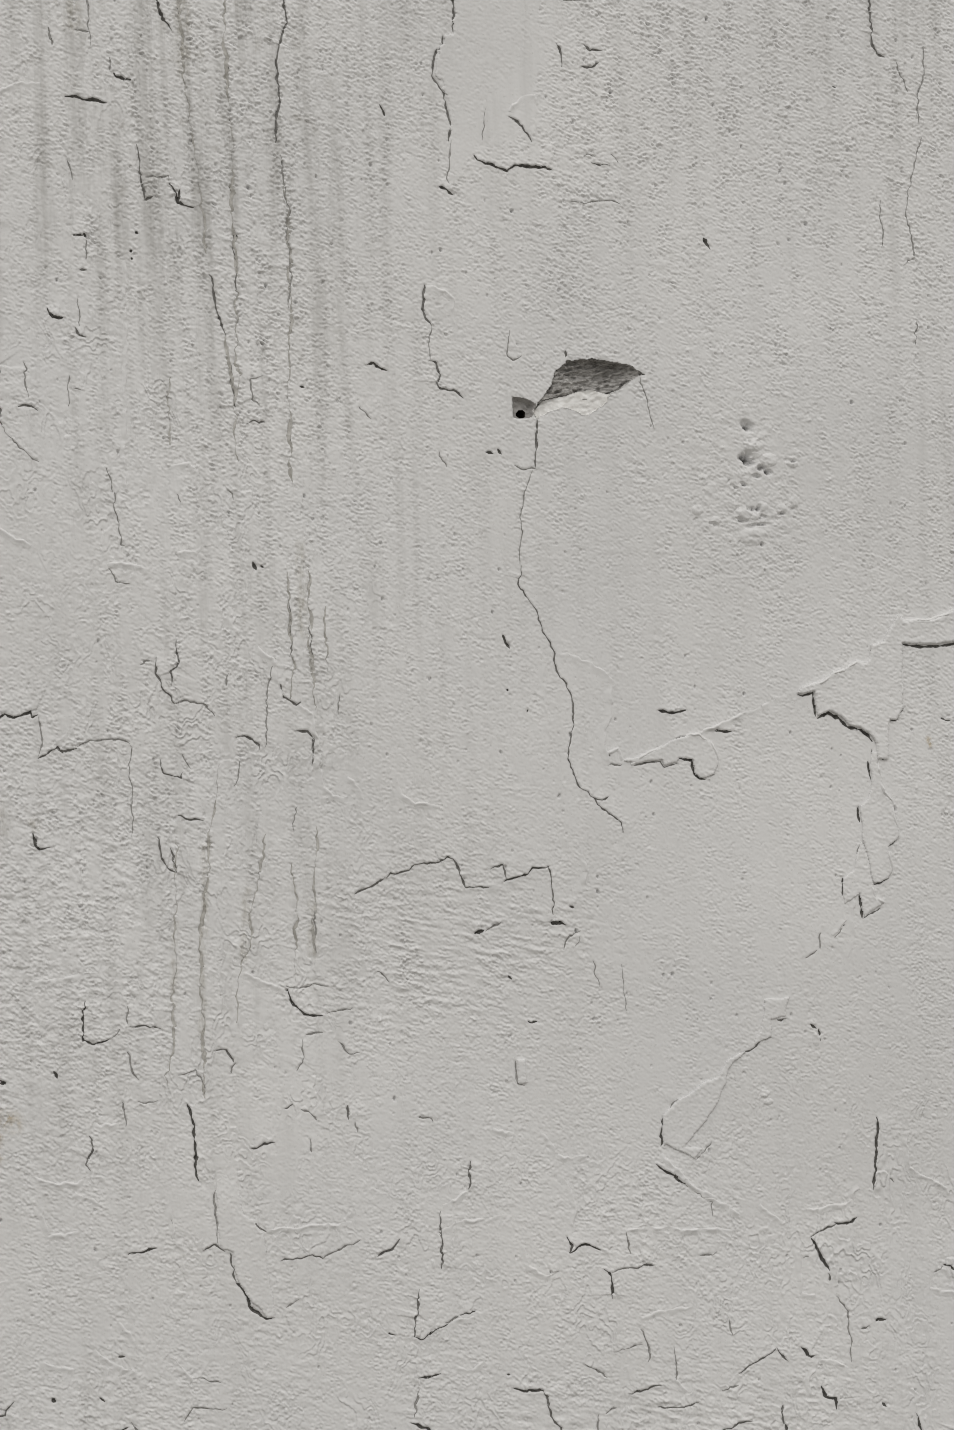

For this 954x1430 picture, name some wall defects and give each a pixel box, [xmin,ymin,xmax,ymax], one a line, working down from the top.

crack [136,144,194,208]
crack [274,0,293,308]
crack [47,233,87,337]
spalling [532,358,642,418]
crack [515,420,623,828]
crack [0,710,190,833]
peeling [608,733,720,780]
peeling [797,609,954,918]
crack [355,854,627,1011]
crack [557,1233,654,1299]
crack [587,1117,954,1430]
crack [514,1388,562,1430]